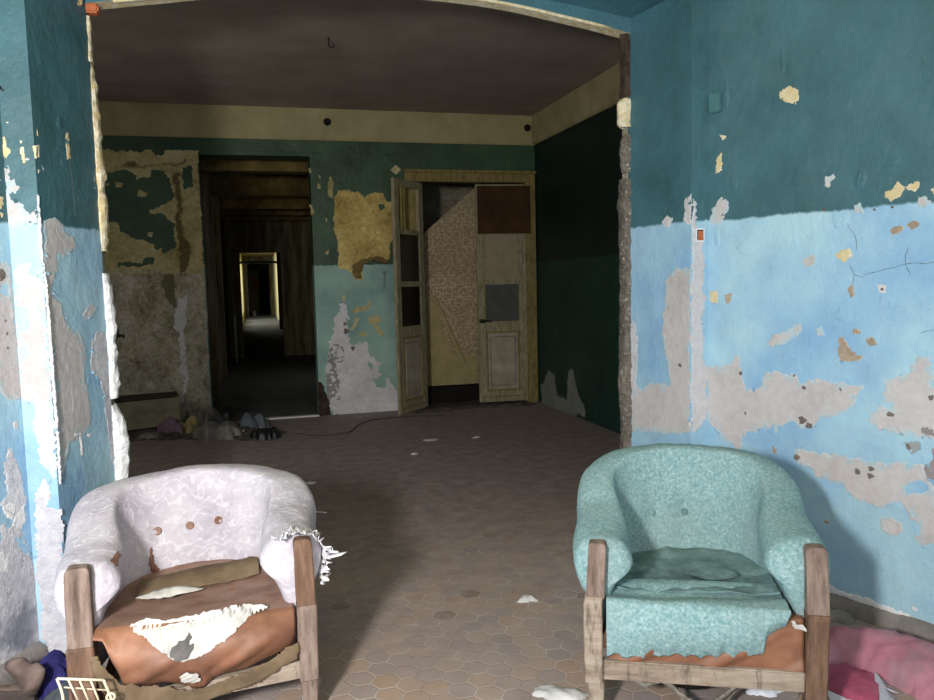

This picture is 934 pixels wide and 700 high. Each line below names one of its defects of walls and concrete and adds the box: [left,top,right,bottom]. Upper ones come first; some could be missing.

peeling [309,168,393,288]
peeling [617,33,864,449]
crack [848,225,933,285]
peeling [884,181,934,208]
peeling [0,0,211,665]
peeling [317,294,398,416]
spalling [837,329,878,364]
peeling [794,355,934,548]